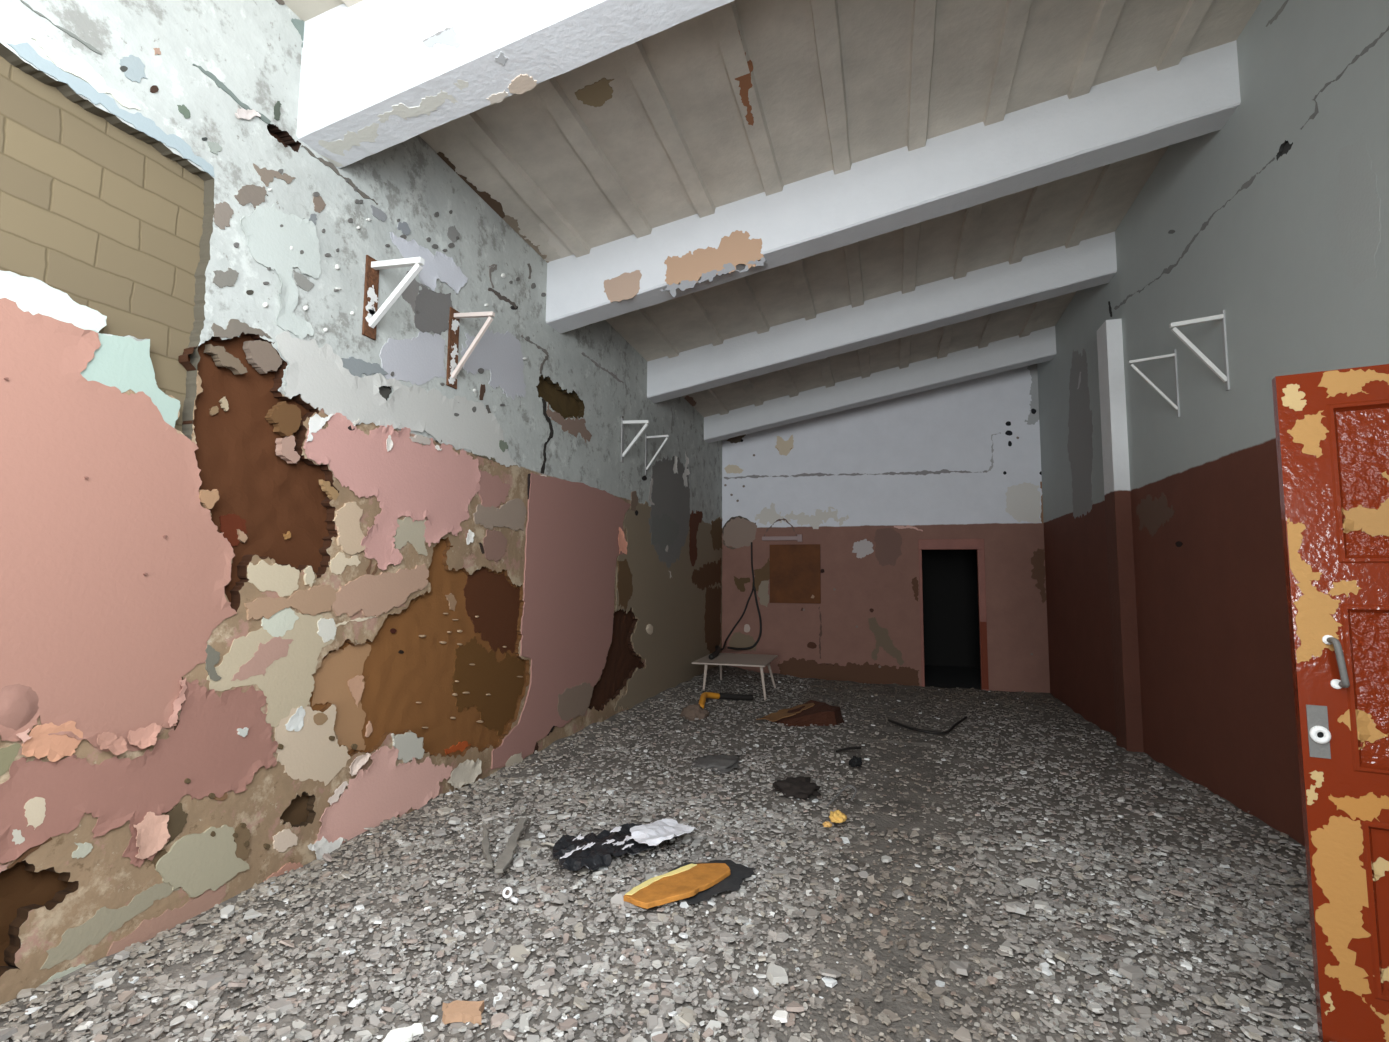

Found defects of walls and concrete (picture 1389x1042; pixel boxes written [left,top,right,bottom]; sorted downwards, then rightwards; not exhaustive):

crack [1300,26,1389,130]
spalling [660,230,767,297]
crack [1108,158,1275,317]
flaking render [0,43,537,828]
crack [488,263,554,499]
hole [536,375,585,419]
crack [582,352,624,383]
peeling [1281,369,1389,458]
peeling [1287,519,1361,664]
peeling [133,812,171,860]
flaking render [0,860,79,976]
peeling [1306,770,1389,1042]